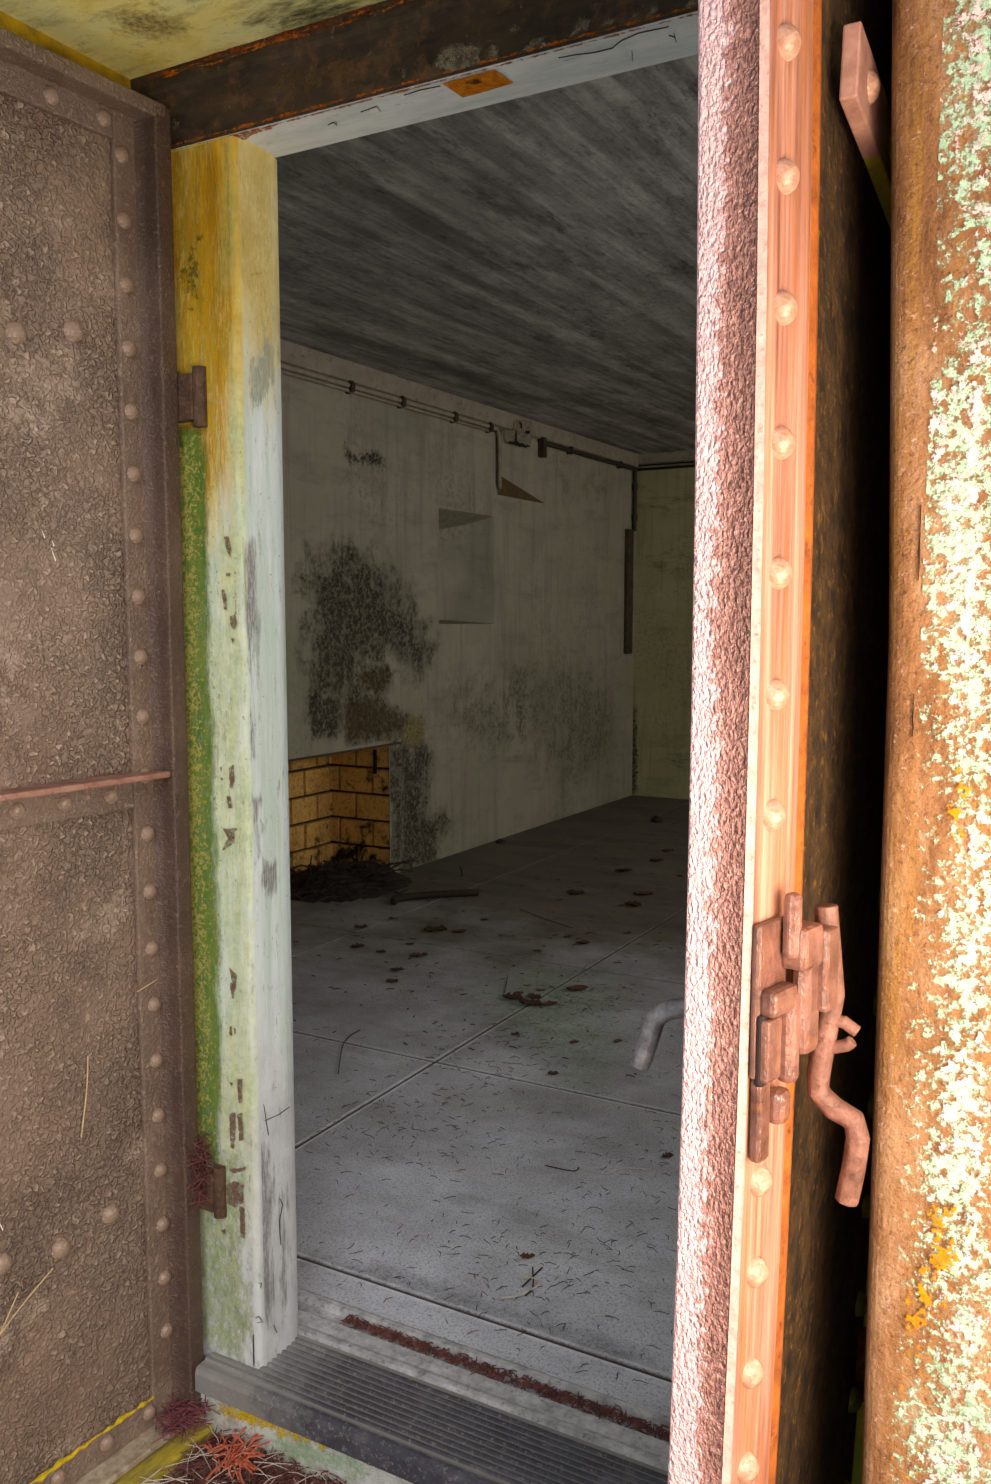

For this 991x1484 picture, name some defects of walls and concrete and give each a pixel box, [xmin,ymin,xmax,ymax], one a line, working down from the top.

water stain [254,0,357,27]
corrosion [148,0,698,148]